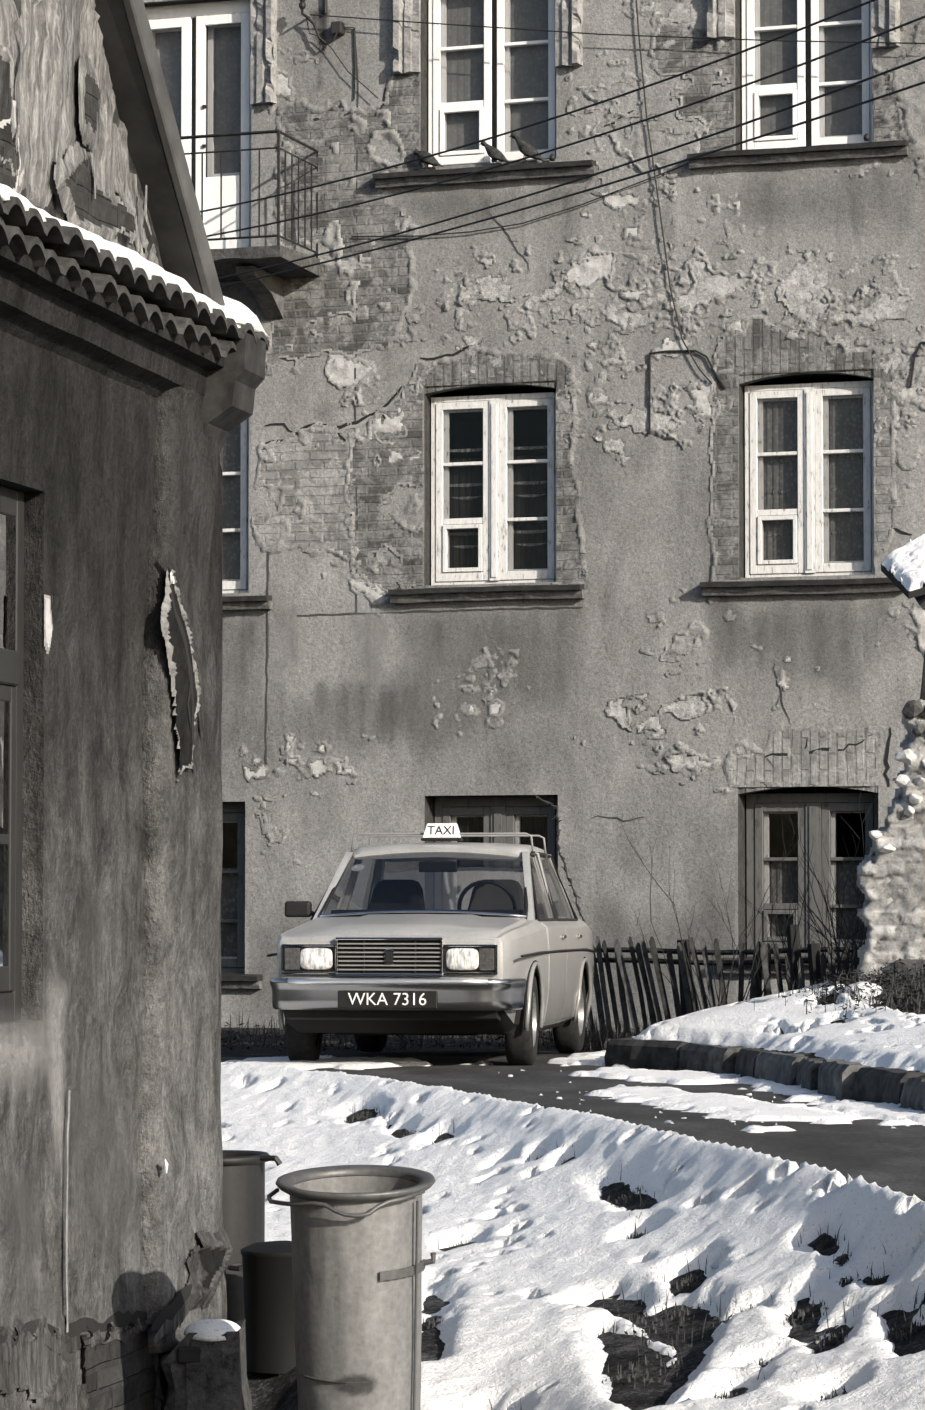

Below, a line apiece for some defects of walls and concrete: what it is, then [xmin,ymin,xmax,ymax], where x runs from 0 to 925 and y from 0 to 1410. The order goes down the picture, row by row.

flaking render [0,0,159,265]
crack [420,341,482,360]
flaking render [250,0,925,678]
crack [260,387,402,449]
spalling [160,567,201,781]
flaking render [432,627,531,737]
flaking render [605,656,883,796]
flaking render [224,729,363,854]
spalling [187,1230,232,1311]
flaking render [0,1308,164,1410]